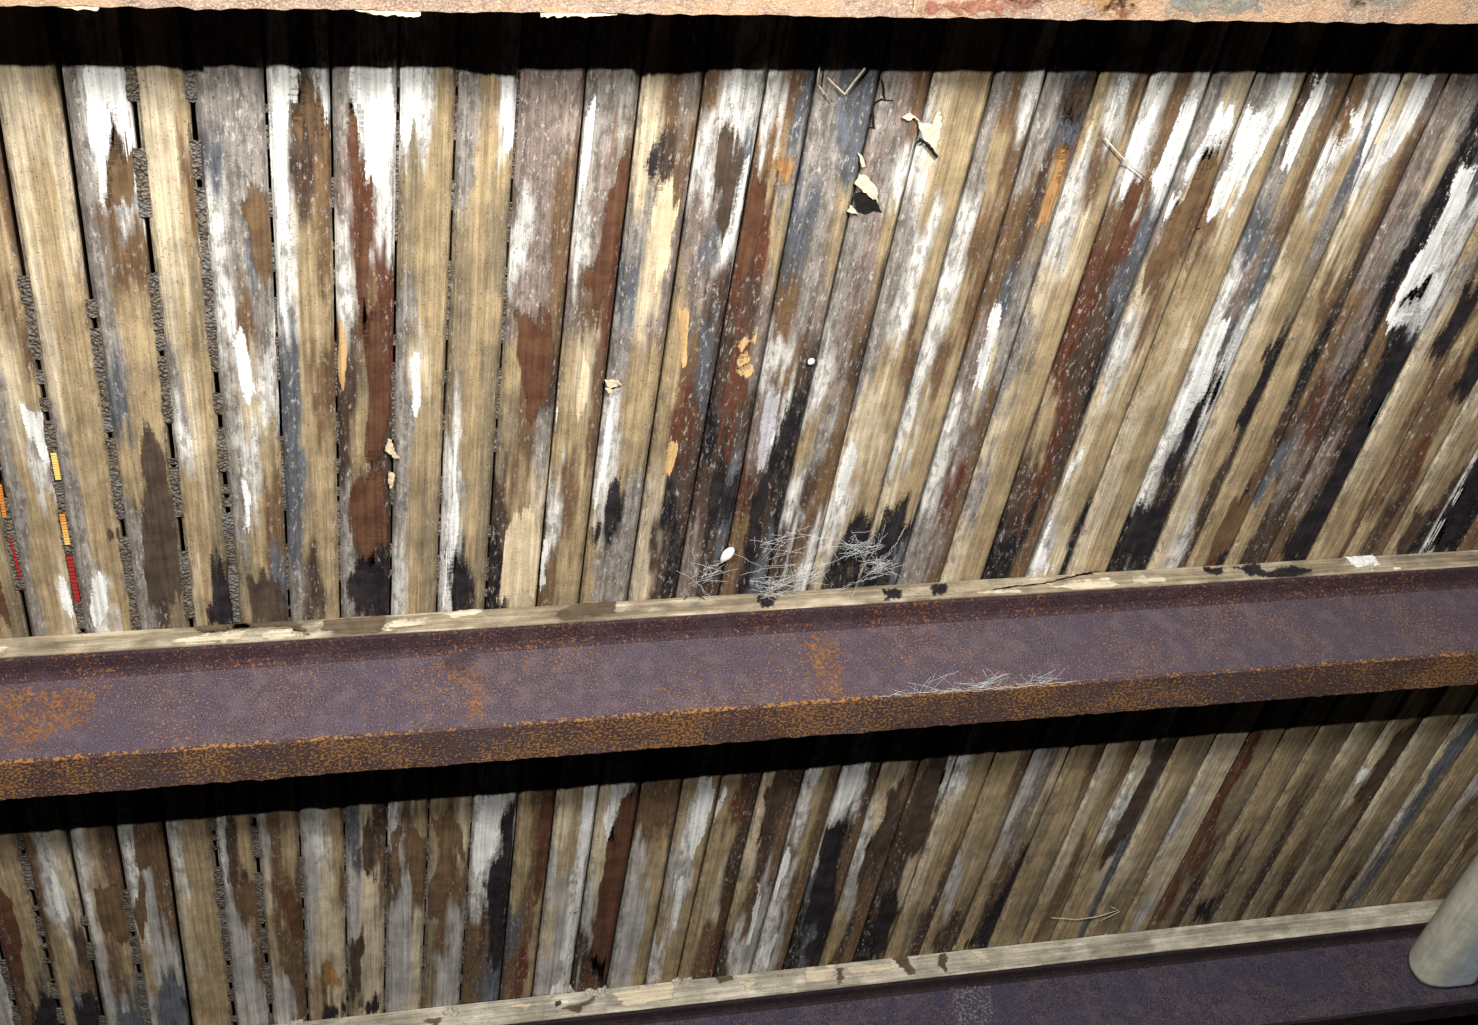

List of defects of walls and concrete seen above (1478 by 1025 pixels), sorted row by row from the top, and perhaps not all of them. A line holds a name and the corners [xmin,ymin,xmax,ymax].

corrosion [912,0,1139,18]
corrosion [0,681,110,754]
corrosion [433,660,490,721]
corrosion [799,629,859,697]